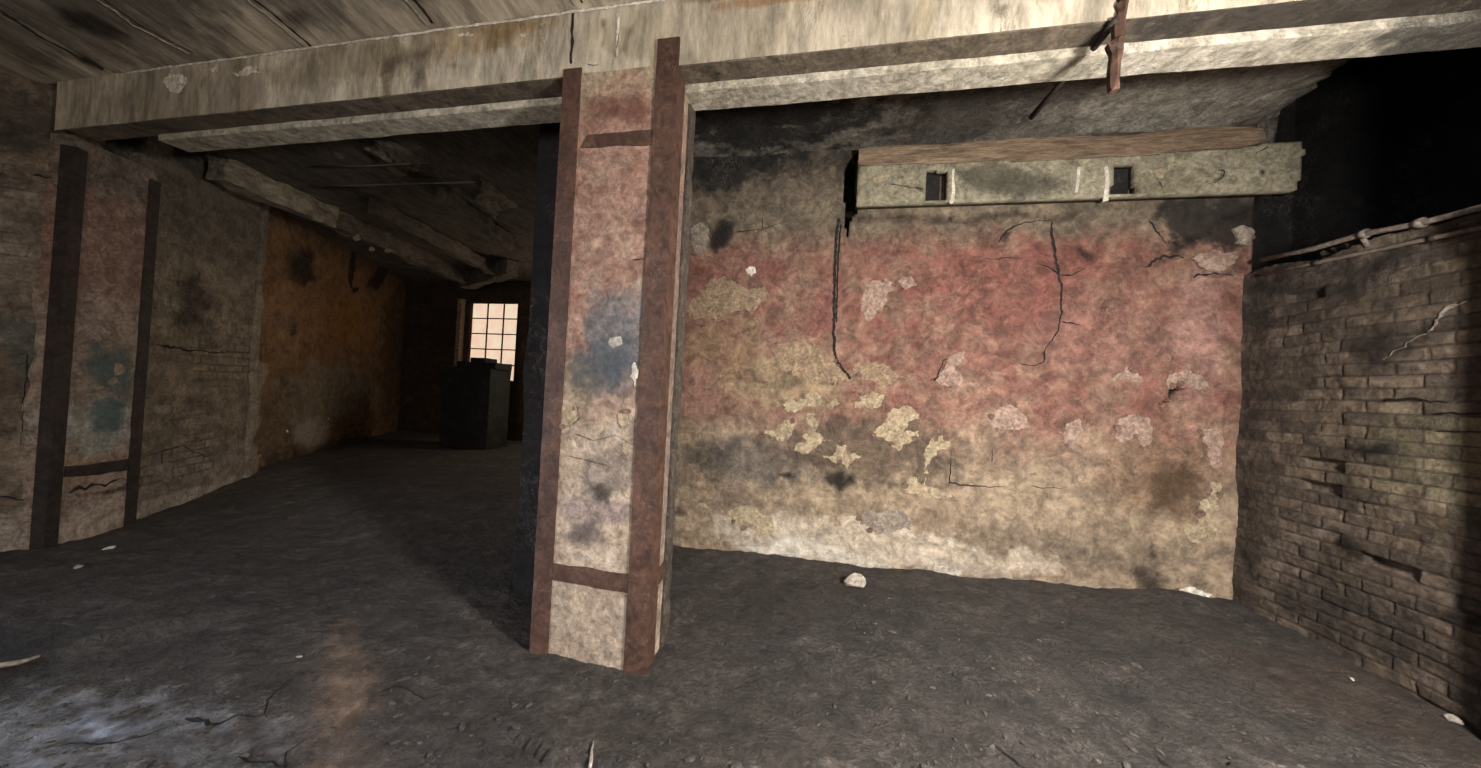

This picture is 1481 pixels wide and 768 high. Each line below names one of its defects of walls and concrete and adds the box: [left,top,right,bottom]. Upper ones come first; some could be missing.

crack [405,0,434,25]
crack [785,218,852,405]
peeling [860,276,917,322]
crack [986,220,1085,366]
peeling [759,340,1004,499]
peeling [987,404,1030,433]
peeling [1060,418,1083,449]
peeling [1114,414,1153,447]
peeling [856,508,912,535]